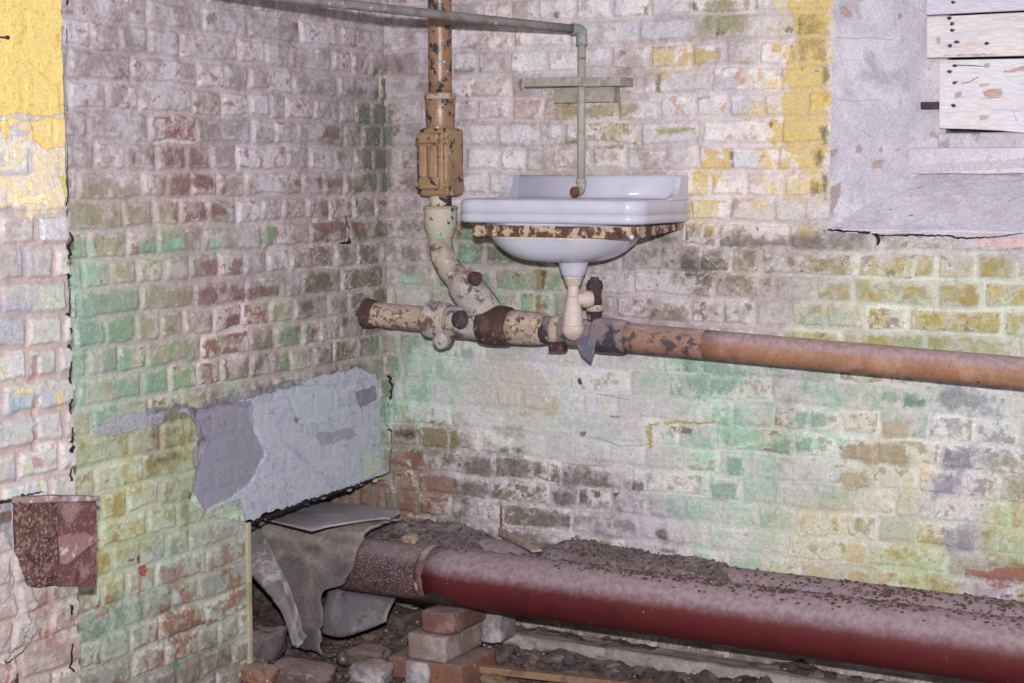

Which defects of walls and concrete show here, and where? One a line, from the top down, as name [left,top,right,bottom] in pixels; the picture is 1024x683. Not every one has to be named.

peeling [0,0,68,241]
peeling [94,359,408,521]
spalling [399,475,459,521]